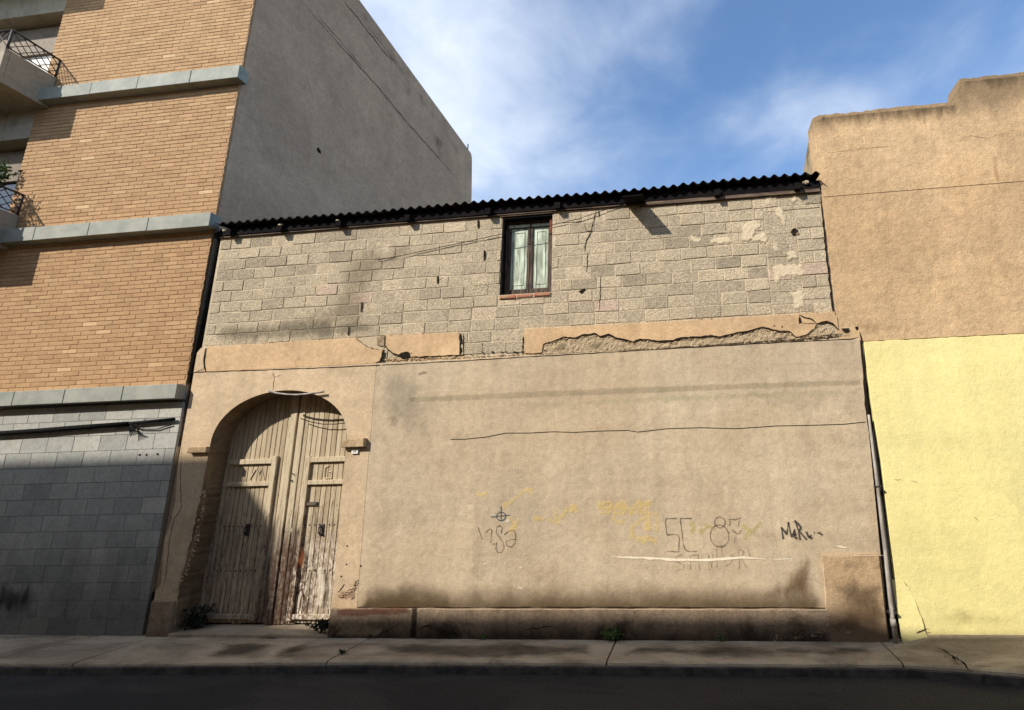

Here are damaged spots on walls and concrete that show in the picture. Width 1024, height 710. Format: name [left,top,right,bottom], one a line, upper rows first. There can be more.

crack [191,204,870,435]
flaking render [348,318,858,363]